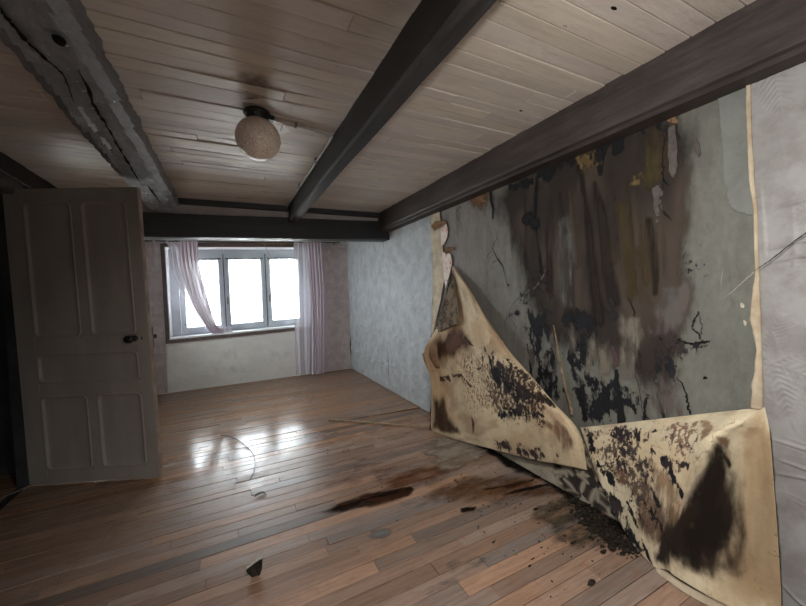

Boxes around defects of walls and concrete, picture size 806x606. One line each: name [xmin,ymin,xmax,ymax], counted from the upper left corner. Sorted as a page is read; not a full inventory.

crack [0,7,161,204]
damp [328,119,745,571]
peeling [652,185,663,224]
crack [721,233,806,297]